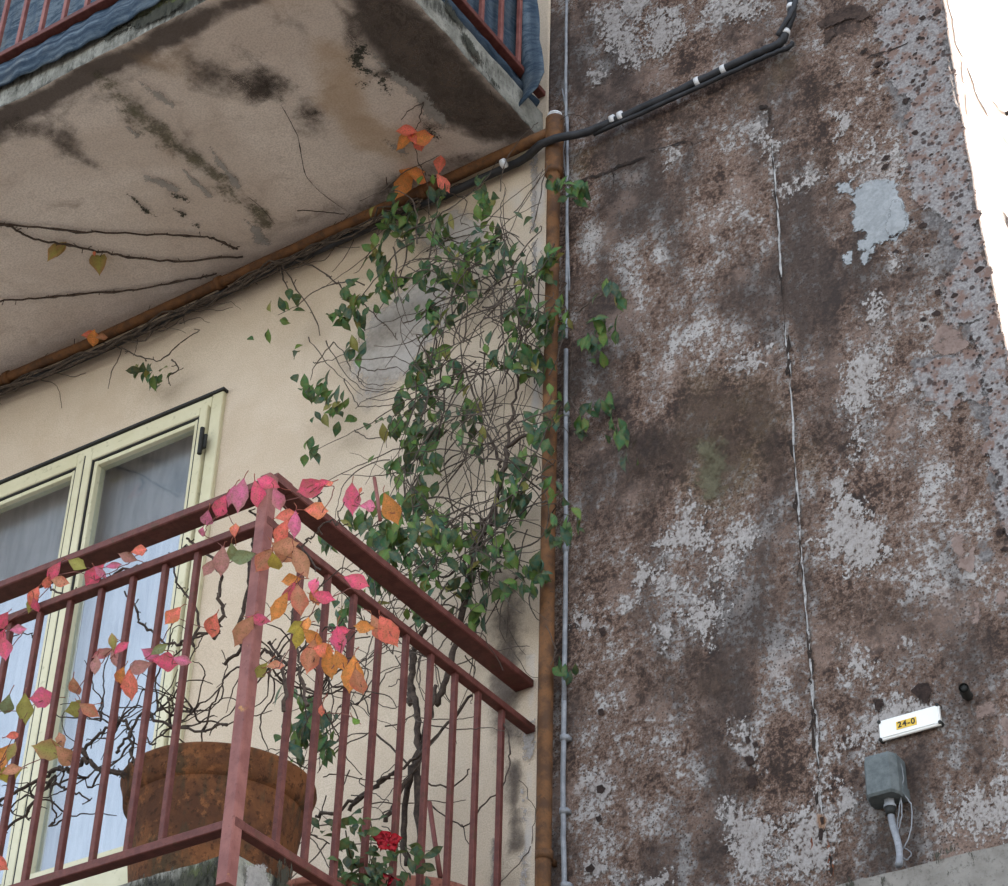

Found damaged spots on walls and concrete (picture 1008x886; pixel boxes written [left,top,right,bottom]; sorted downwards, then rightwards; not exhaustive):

damp [191,62,282,102]
damp [347,0,526,136]
crack [581,121,735,184]
peeling [662,145,684,172]
damp [144,175,200,229]
damp [244,204,271,245]
flaking render [747,0,1008,582]
crack [756,105,834,878]
peeling [976,701,1008,749]
peeling [942,779,1008,848]